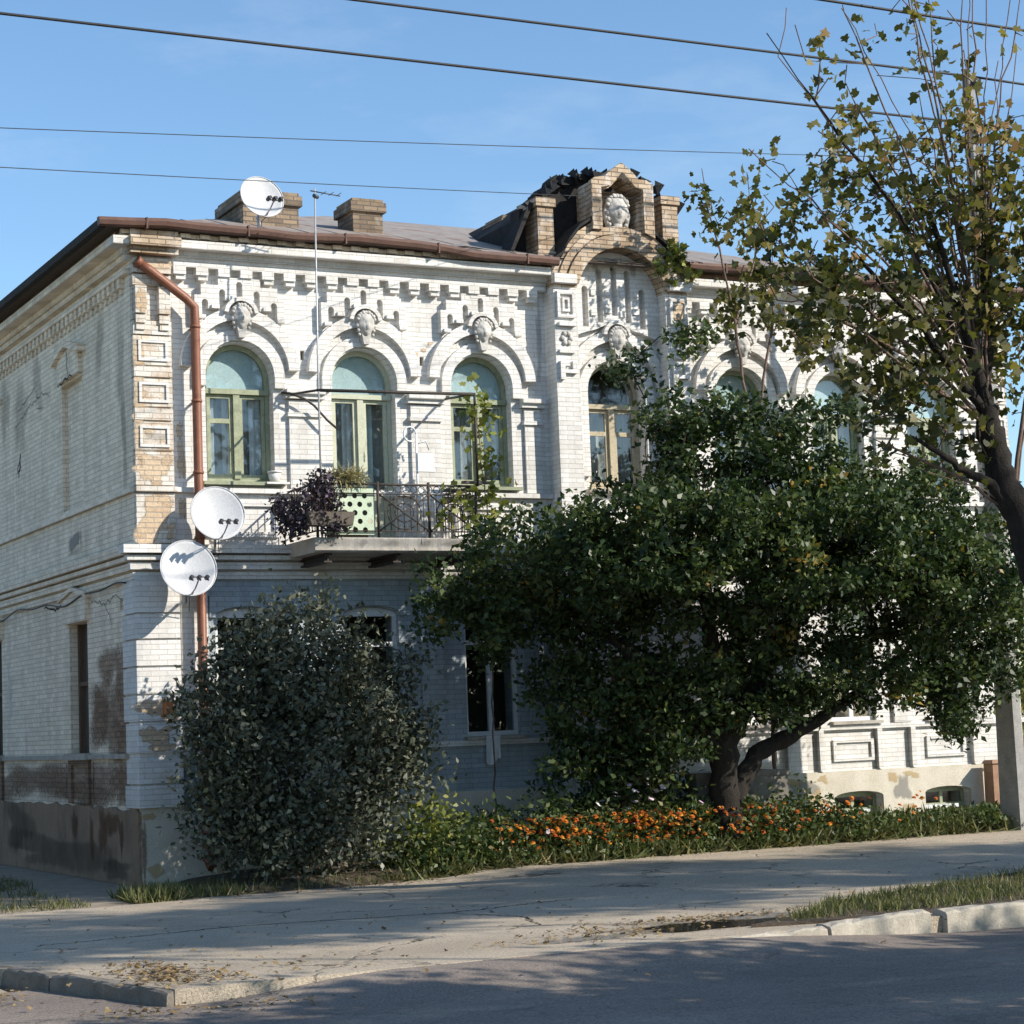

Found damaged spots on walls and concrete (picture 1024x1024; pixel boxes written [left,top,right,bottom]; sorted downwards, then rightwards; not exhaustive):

peeling [135,288,147,312]
peeling [132,338,186,544]
peeling [4,650,179,878]
peeling [889,771,918,809]